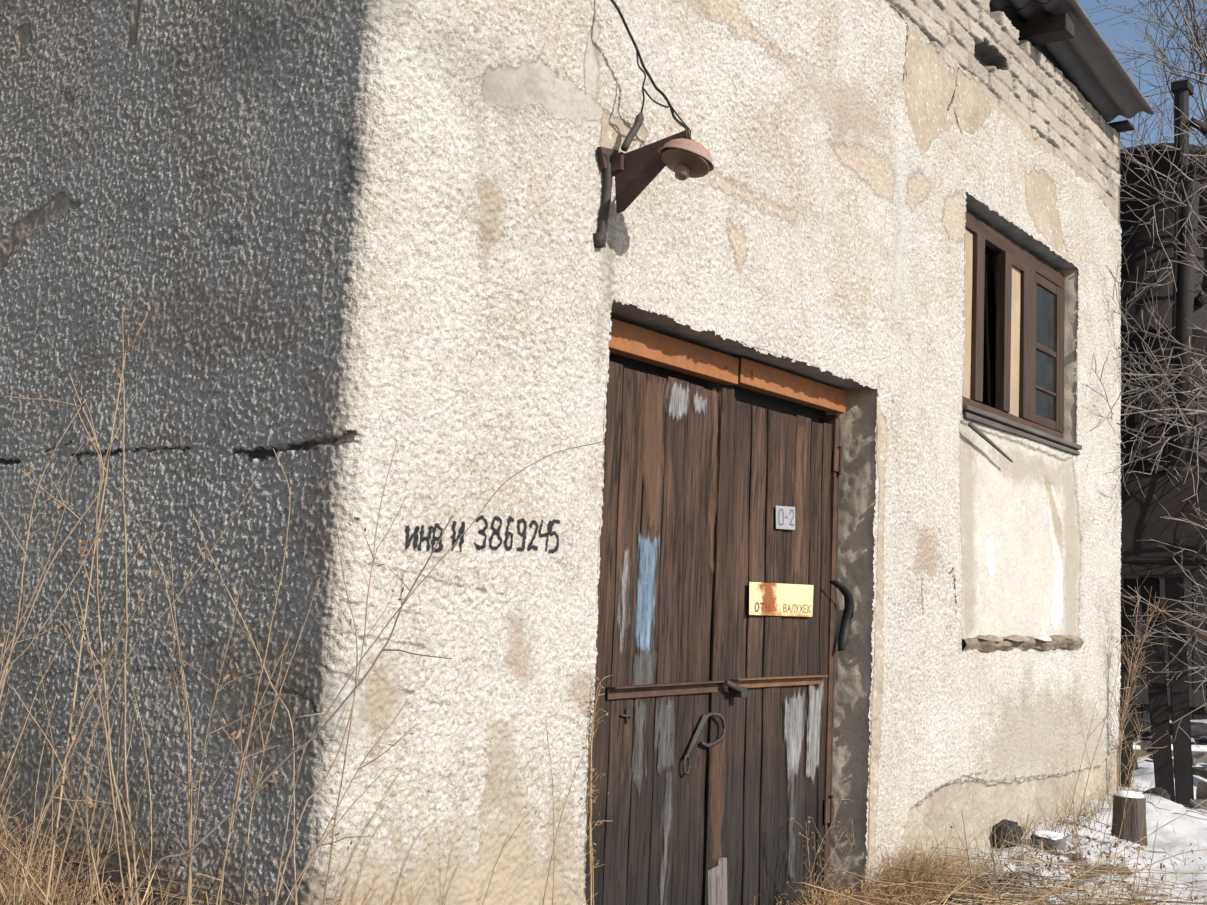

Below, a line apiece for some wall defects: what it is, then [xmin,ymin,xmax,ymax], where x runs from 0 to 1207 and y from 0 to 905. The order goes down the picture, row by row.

peeling [828,24,1051,212]
peeling [941,191,965,243]
peeling [1025,167,1070,260]
crack [0,441,190,465]
crack [233,430,359,462]
peeling [959,421,1082,654]